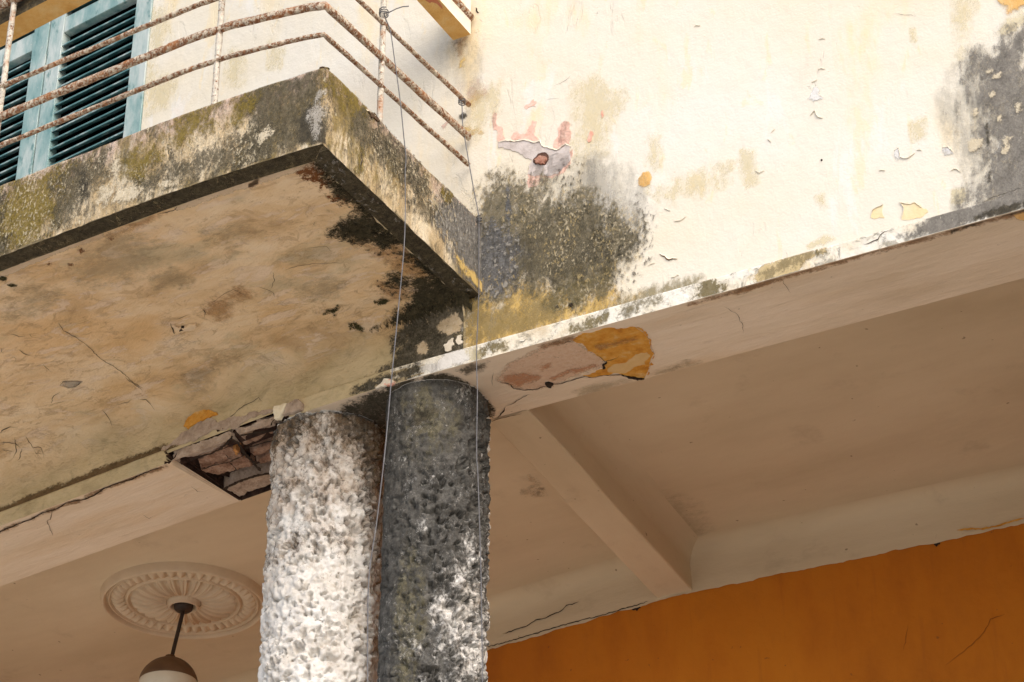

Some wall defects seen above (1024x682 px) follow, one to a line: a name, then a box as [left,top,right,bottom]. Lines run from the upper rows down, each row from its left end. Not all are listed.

flaking render [492,99,573,188]
damp [898,25,1024,238]
peeling [870,204,884,219]
peeling [900,201,928,220]
crack [59,324,154,422]
damp [0,69,728,682]
peeling [495,327,655,390]
spalling [161,399,304,497]
crack [0,466,164,535]
crack [487,601,647,647]